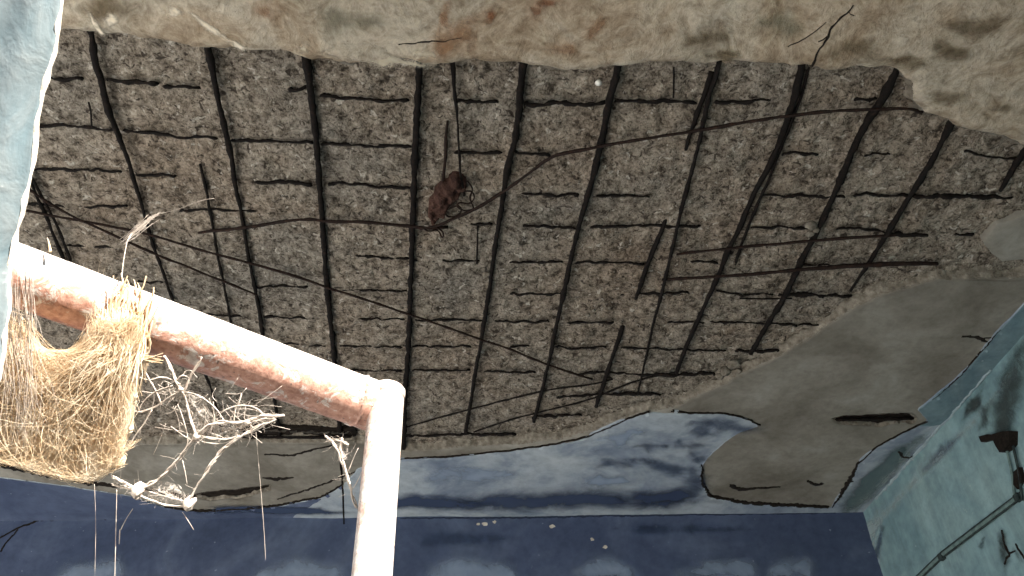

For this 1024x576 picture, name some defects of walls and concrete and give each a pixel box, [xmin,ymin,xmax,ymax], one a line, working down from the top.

crack [787,5,854,67]
spalling [9,28,1024,462]
peeling [111,355,366,514]
peeling [671,280,1024,509]